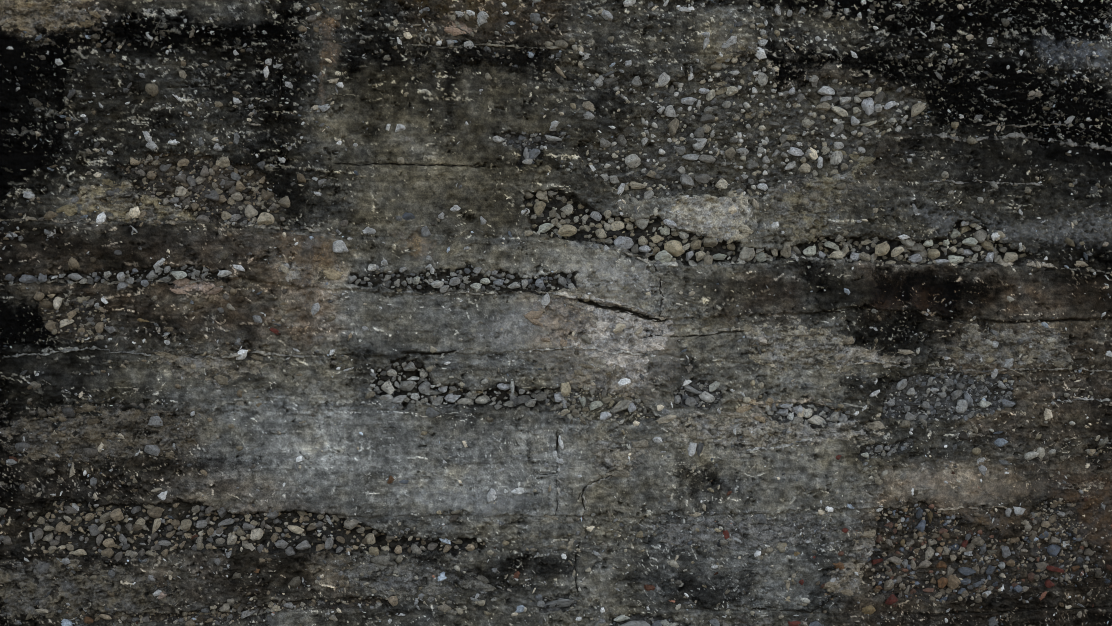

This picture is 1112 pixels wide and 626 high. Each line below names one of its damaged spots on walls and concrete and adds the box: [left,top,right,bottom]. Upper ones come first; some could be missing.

damp [0,300,59,347]
crack [578,264,741,339]